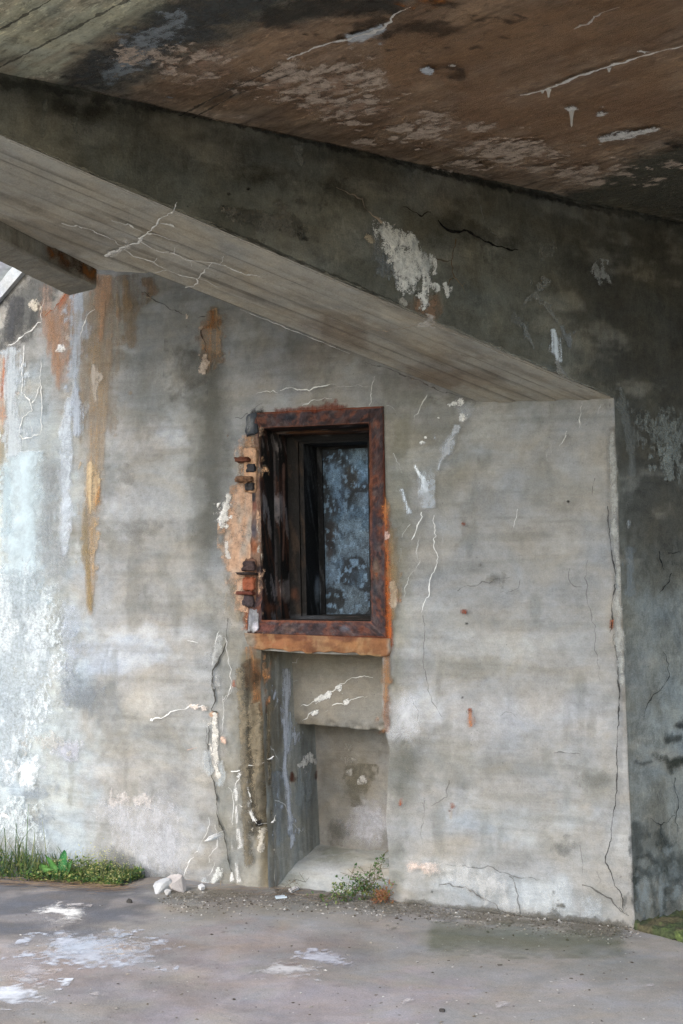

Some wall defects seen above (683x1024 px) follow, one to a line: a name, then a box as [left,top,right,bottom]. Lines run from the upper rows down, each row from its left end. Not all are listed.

damp [67,0,453,91]
damp [598,127,660,145]
crack [62,202,265,319]
corrosion [198,308,223,375]
peeling [414,293,442,321]
damp [0,278,56,604]
corrosion [47,247,119,608]
crack [300,676,373,721]
crack [582,478,670,916]
crack [150,620,276,877]
damp [656,755,683,773]
damp [624,822,683,919]